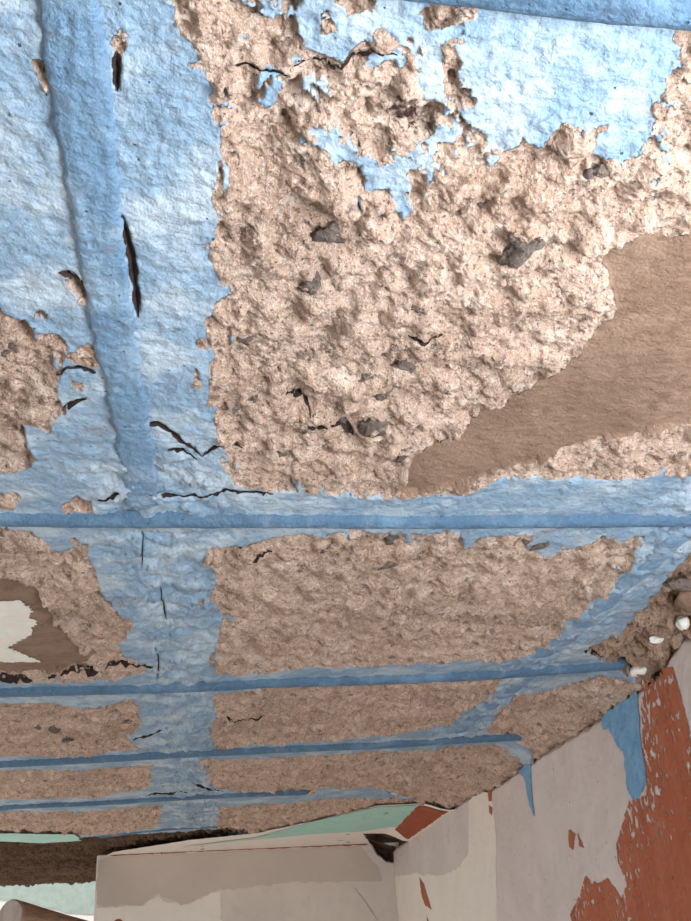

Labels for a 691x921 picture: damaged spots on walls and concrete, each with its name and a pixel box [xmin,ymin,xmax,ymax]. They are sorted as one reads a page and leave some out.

spalling [32,59,50,93]
crack [113,52,121,92]
spalling [66,276,87,305]
crack [122,216,140,319]
spalling [166,0,691,502]
spalling [0,309,100,474]
crack [149,421,243,460]
spalling [0,527,148,685]
spalling [198,529,645,677]
peeling [0,554,691,921]